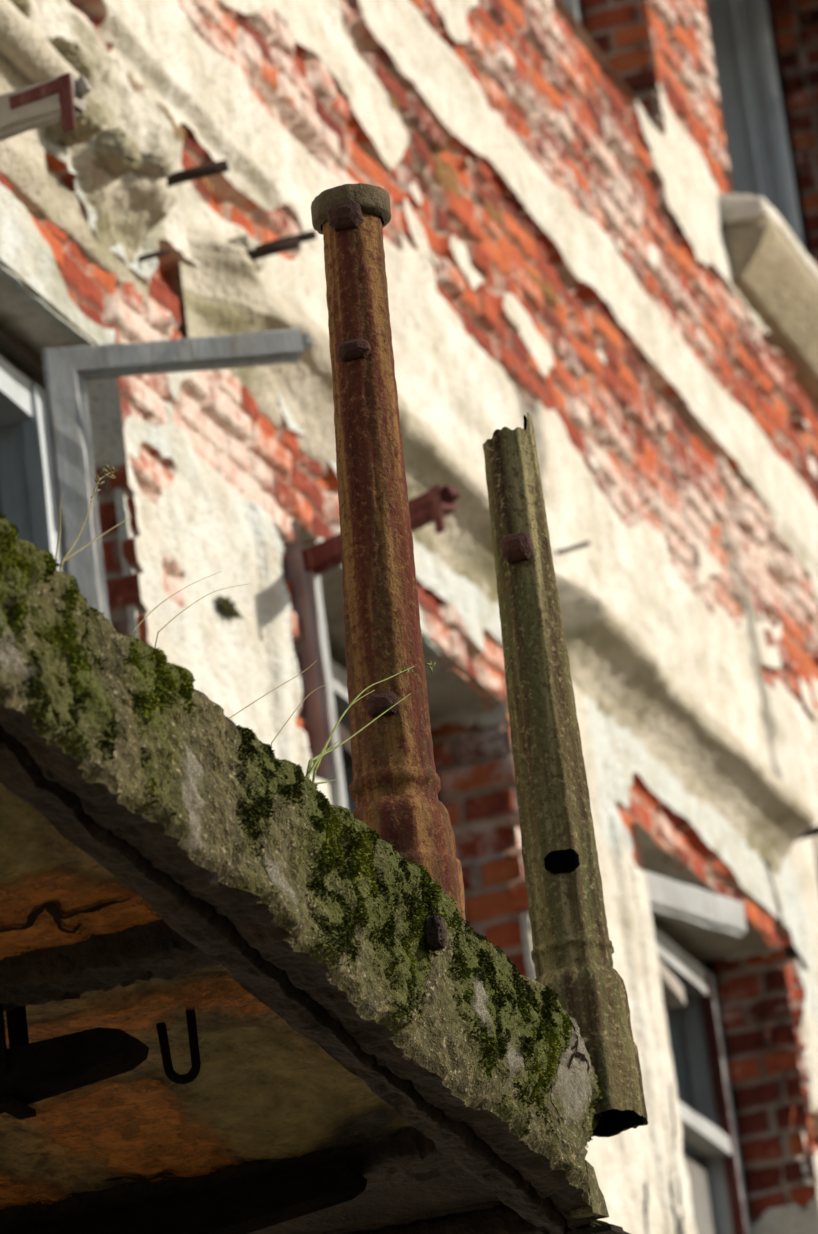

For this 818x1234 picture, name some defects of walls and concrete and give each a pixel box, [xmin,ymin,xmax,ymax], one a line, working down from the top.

spalling [178,0,818,725]
spalling [94,442,177,647]
spalling [118,369,340,749]
efflorescence [183,748,203,846]
crack [0,897,131,933]
corrosion [0,873,162,960]
corrosion [27,978,268,1040]
efflorescence [474,982,489,1022]
spalling [615,773,818,1226]
leakage [507,1049,523,1070]
leakage [558,1025,591,1111]
corrosion [26,1079,235,1181]